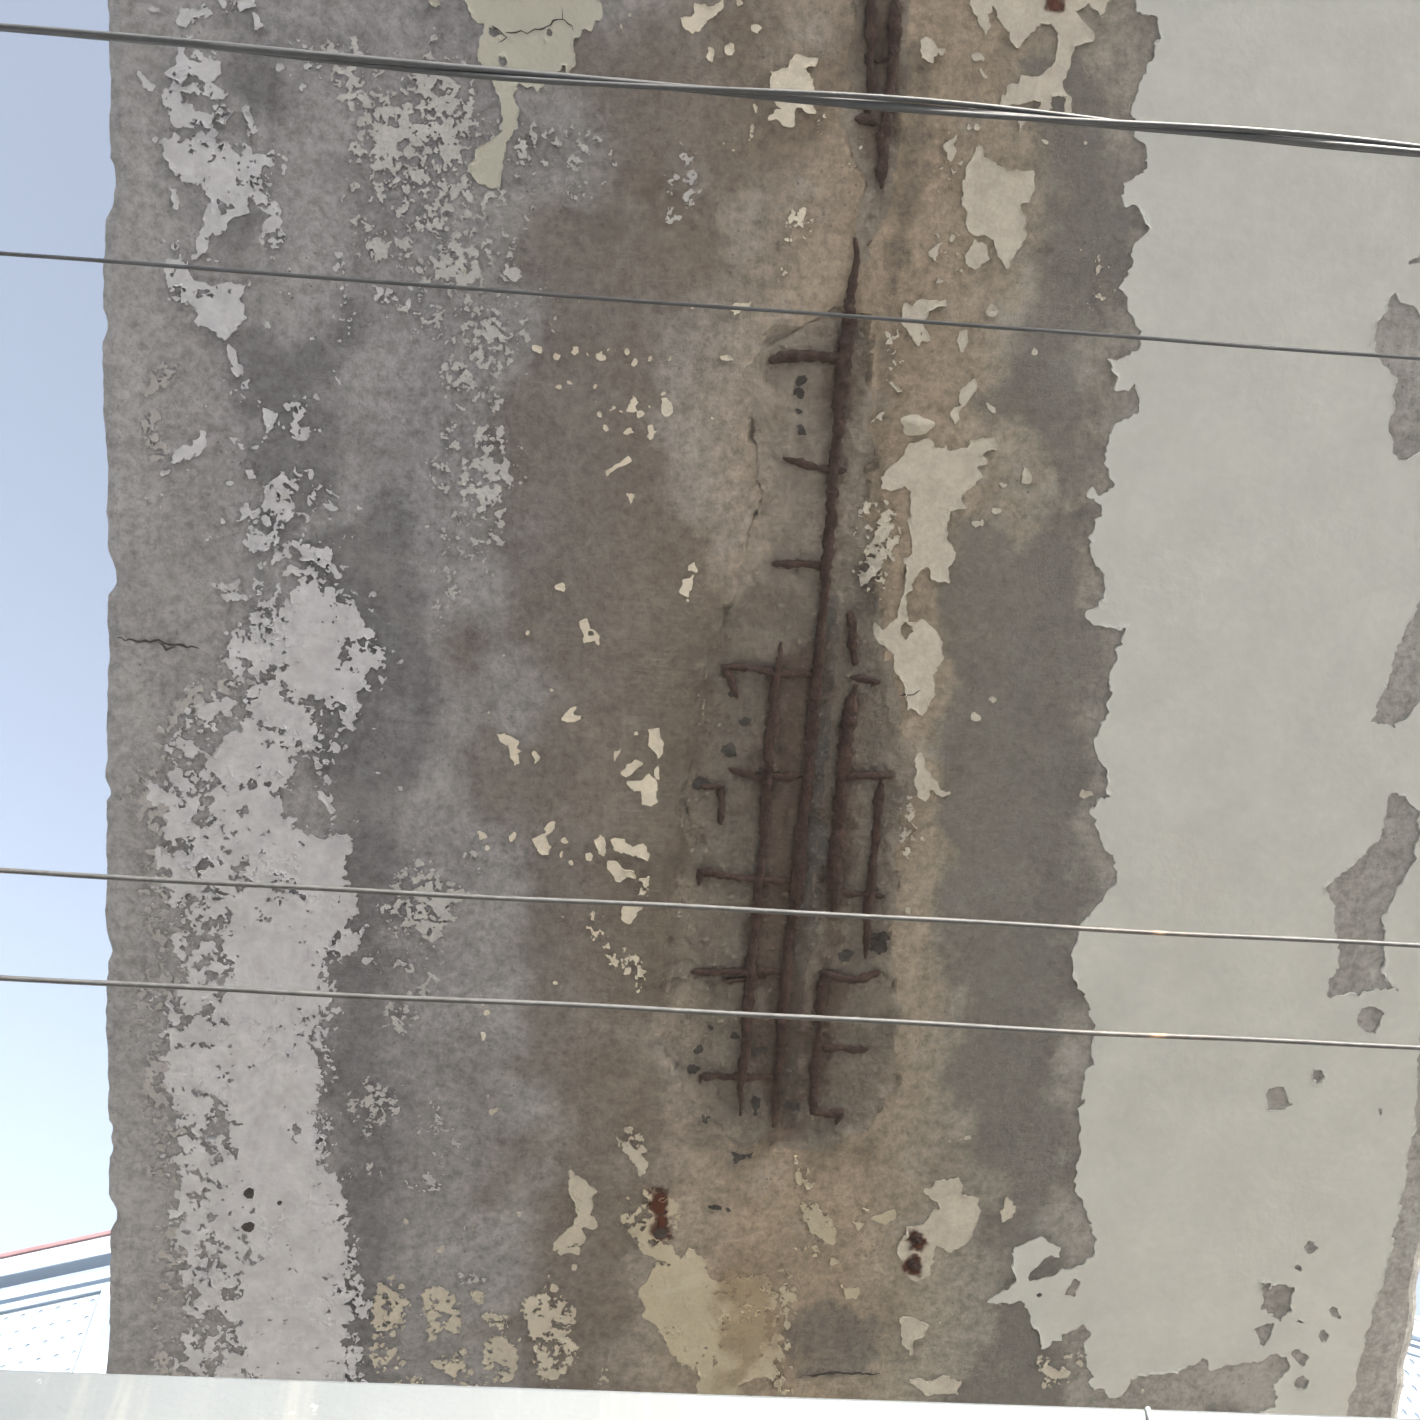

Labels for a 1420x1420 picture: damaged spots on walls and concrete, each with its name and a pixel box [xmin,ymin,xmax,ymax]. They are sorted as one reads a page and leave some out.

peeling [137,0,322,450]
damp [320,13,617,633]
peeling [464,0,603,189]
crack [117,637,200,651]
peeling [126,467,581,1388]
damp [340,1076,468,1193]
damp [374,849,470,1036]
rust [647,1188,672,1242]
spalling [662,0,1035,1266]
damp [945,1258,1061,1406]
damp [940,526,1097,1243]
peeling [969,0,1420,1416]